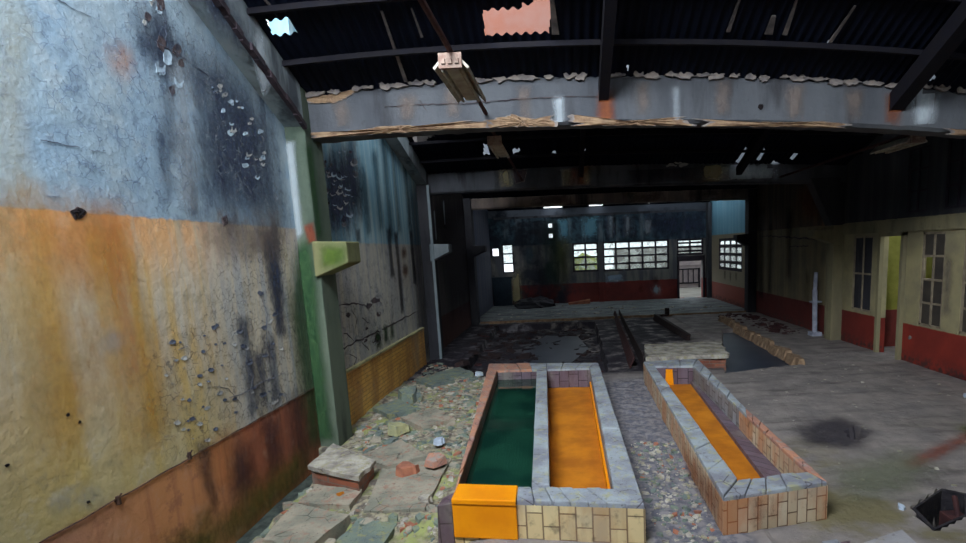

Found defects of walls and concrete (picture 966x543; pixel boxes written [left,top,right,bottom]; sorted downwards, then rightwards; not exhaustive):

peeling [142,0,165,25]
water stain [138,15,184,70]
peeling [155,35,184,96]
water stain [257,40,267,85]
peeling [211,84,263,136]
water stain [191,63,285,334]
peeling [242,151,266,180]
water stain [288,144,299,234]
water stain [239,320,280,414]
spalling [912,488,966,531]